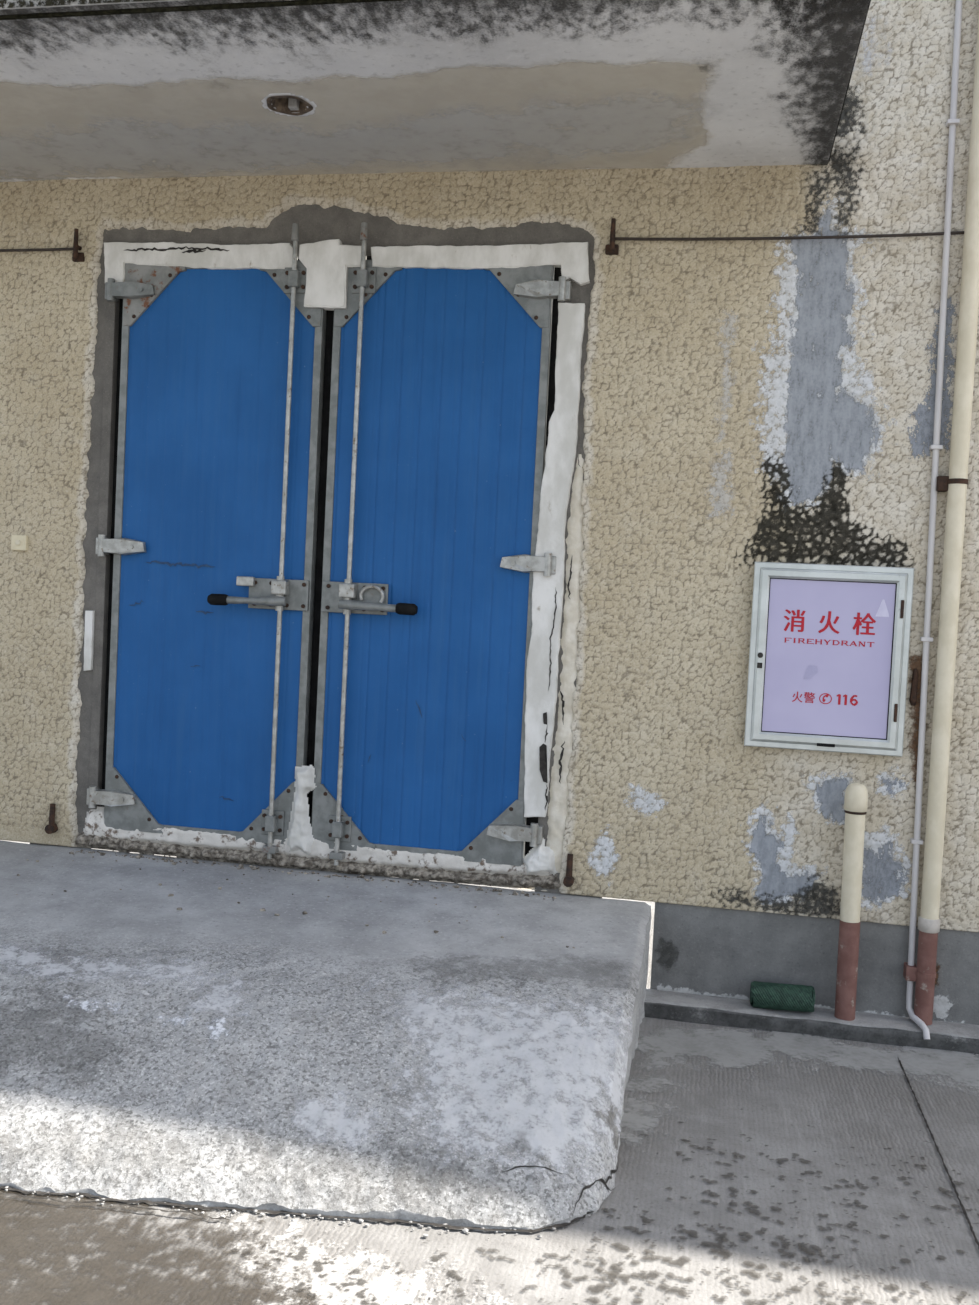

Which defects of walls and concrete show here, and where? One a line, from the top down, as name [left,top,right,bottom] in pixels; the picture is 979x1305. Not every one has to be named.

water stain [0,0,871,236]
crack [126,245,229,253]
peeling [749,195,957,509]
water stain [735,456,913,567]
peeling [807,772,853,825]
peeling [876,767,913,798]
peeling [745,805,827,905]
peeling [861,825,912,908]
crack [0,1163,619,1232]